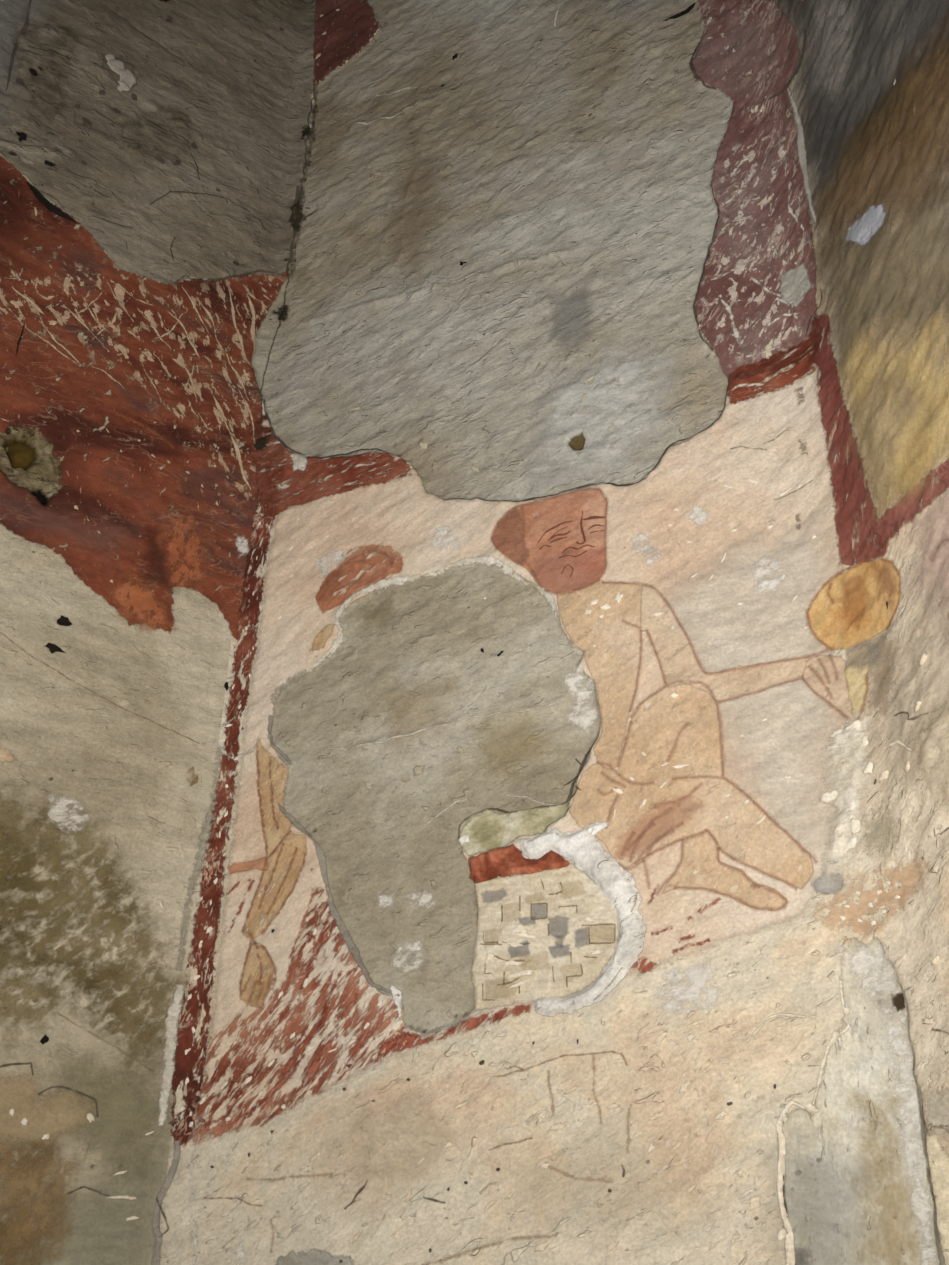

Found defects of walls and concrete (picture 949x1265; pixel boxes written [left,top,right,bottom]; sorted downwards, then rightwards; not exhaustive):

flaking render [0,0,339,500]
crack [26,83,398,458]
flaking render [846,204,886,246]
peeling [161,515,205,587]
spalling [45,643,65,654]
spalling [57,615,72,626]
peeling [110,573,172,629]
peeling [213,704,254,761]
flaking render [458,800,571,884]
spalling [776,873,949,1265]
flaking render [276,1233,360,1265]